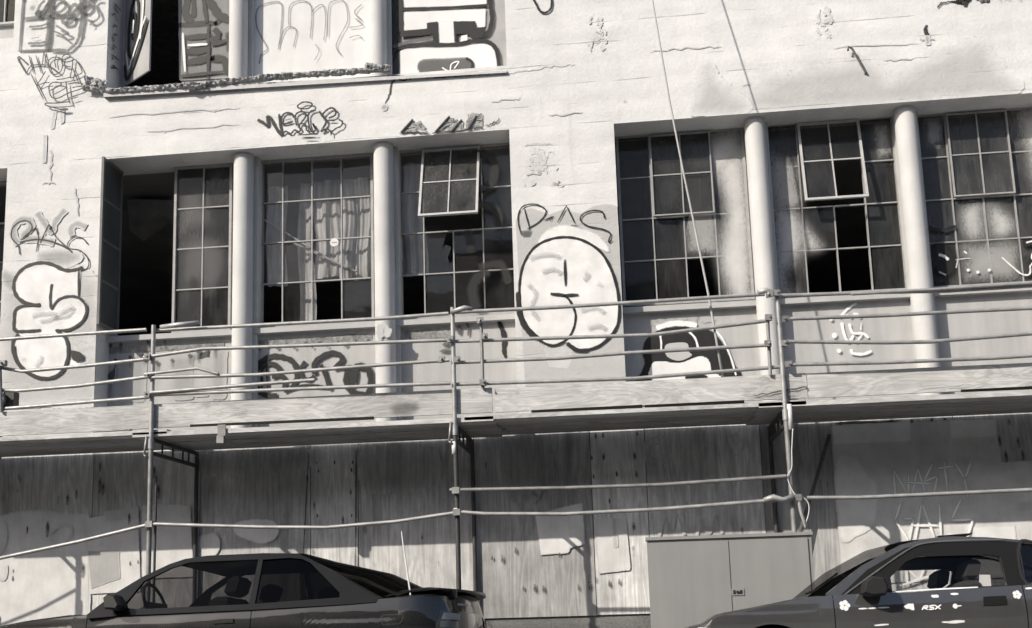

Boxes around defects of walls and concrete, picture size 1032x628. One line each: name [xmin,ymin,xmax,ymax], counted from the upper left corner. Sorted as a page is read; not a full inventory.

crack [651,44,721,52]
crack [836,25,934,61]